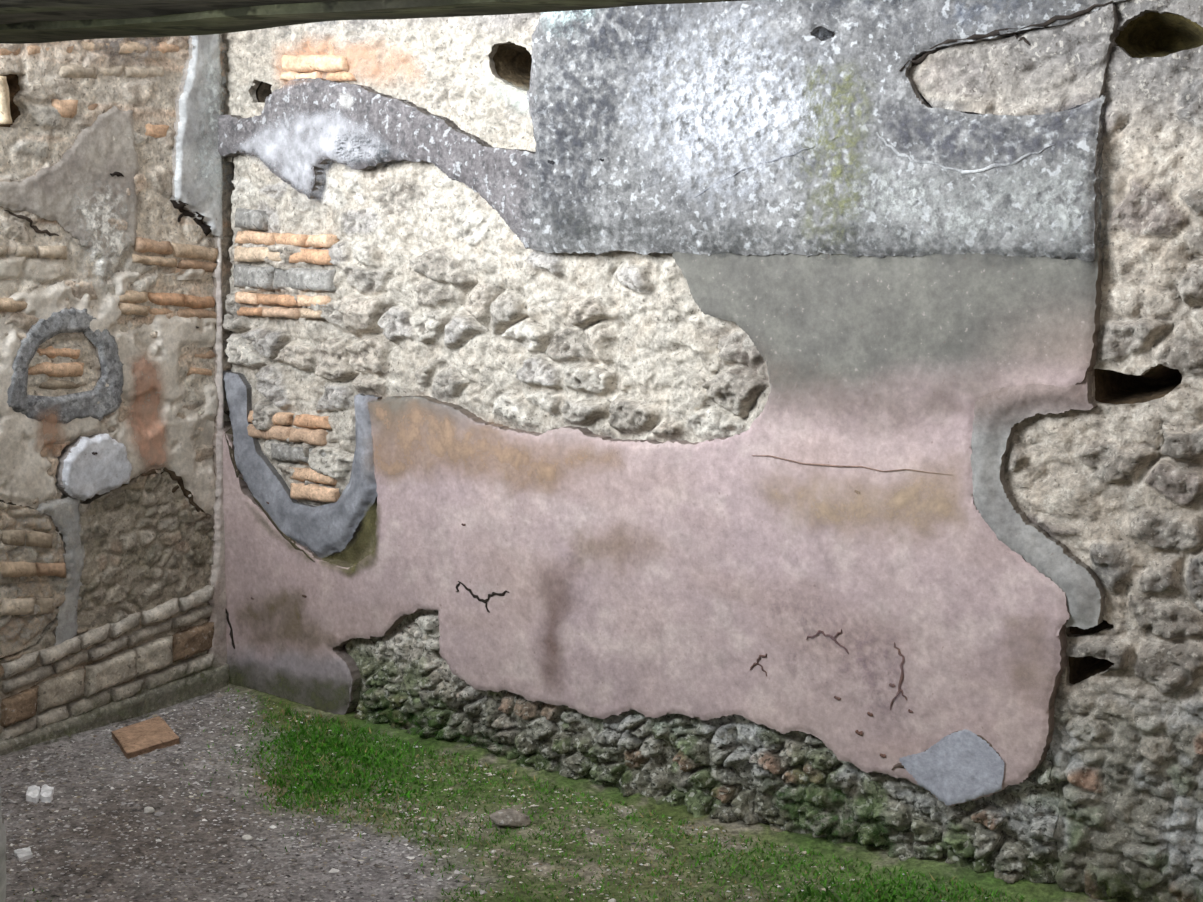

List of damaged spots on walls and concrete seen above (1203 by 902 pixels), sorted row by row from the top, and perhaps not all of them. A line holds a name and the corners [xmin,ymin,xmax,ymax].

spalling [59,40,179,79]
spalling [0,74,21,127]
spalling [222,12,541,152]
crack [4,210,59,236]
crack [170,200,211,236]
spalling [118,154,771,506]
spalling [28,346,86,390]
spalling [345,0,1203,902]
crack [751,455,952,475]
crack [456,581,509,613]
crack [750,654,767,676]
crack [890,642,907,710]